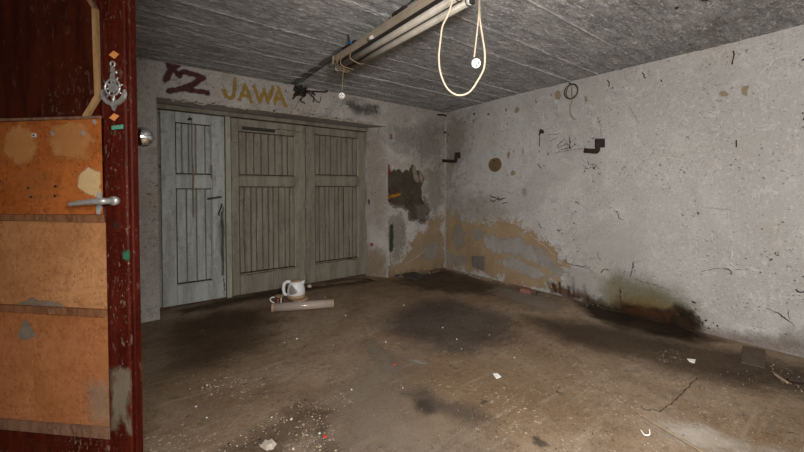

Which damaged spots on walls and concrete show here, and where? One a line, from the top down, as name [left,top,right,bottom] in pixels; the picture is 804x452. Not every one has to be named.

peeling [388,165,571,291]
damp [537,278,804,390]